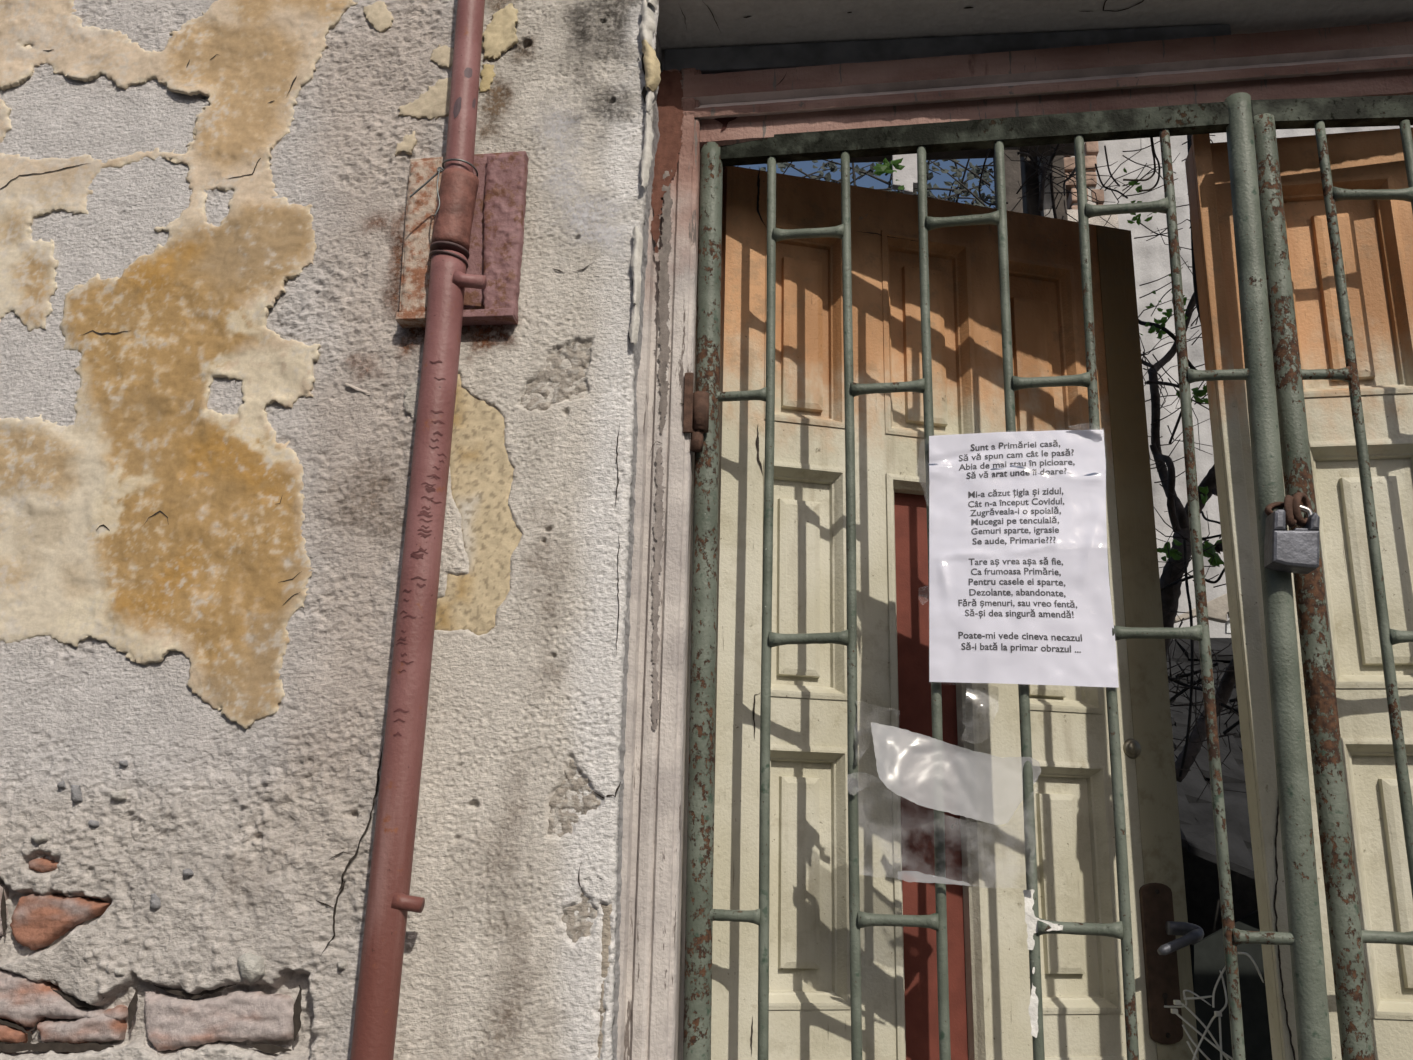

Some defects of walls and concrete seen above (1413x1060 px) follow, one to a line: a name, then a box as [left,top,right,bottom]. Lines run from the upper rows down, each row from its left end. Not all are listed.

peeling [479,3,519,93]
peeling [395,45,454,156]
peeling [0,0,394,729]
flaking render [435,374,522,635]
flaking render [57,780,83,803]
flaking render [547,759,601,837]
flaking render [28,833,59,873]
crack [317,747,383,957]
flaking render [0,883,112,950]
flaking render [150,893,161,910]
flaking render [0,952,302,1054]